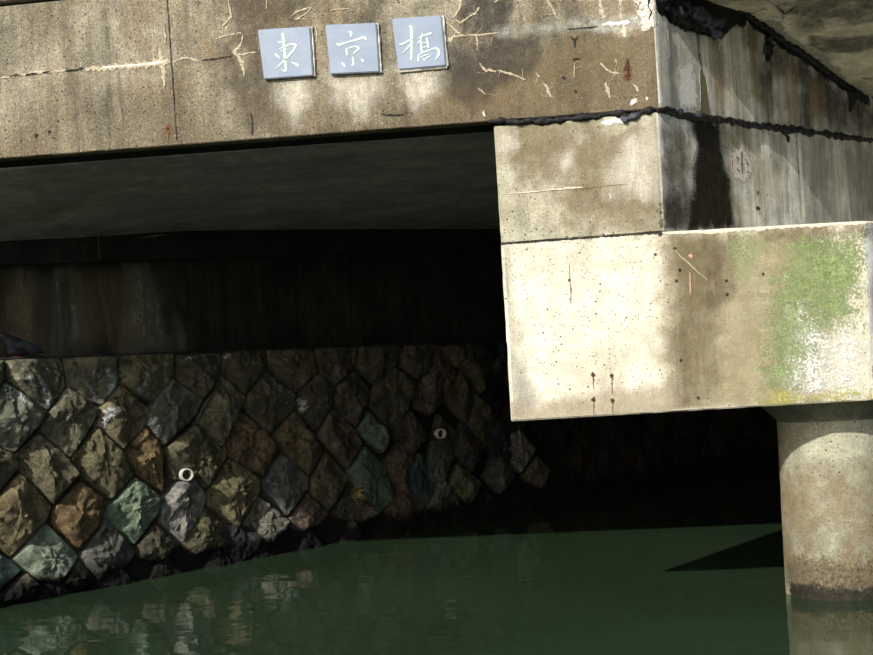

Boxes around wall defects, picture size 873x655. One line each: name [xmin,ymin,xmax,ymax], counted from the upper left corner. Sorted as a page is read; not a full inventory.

crack [0,58,85,78]
crack [166,0,260,140]
crack [445,0,580,99]
crack [600,59,639,101]
spalling [632,0,657,31]
crack [698,34,711,115]
water stain [499,28,873,419]
water stain [787,556,873,601]